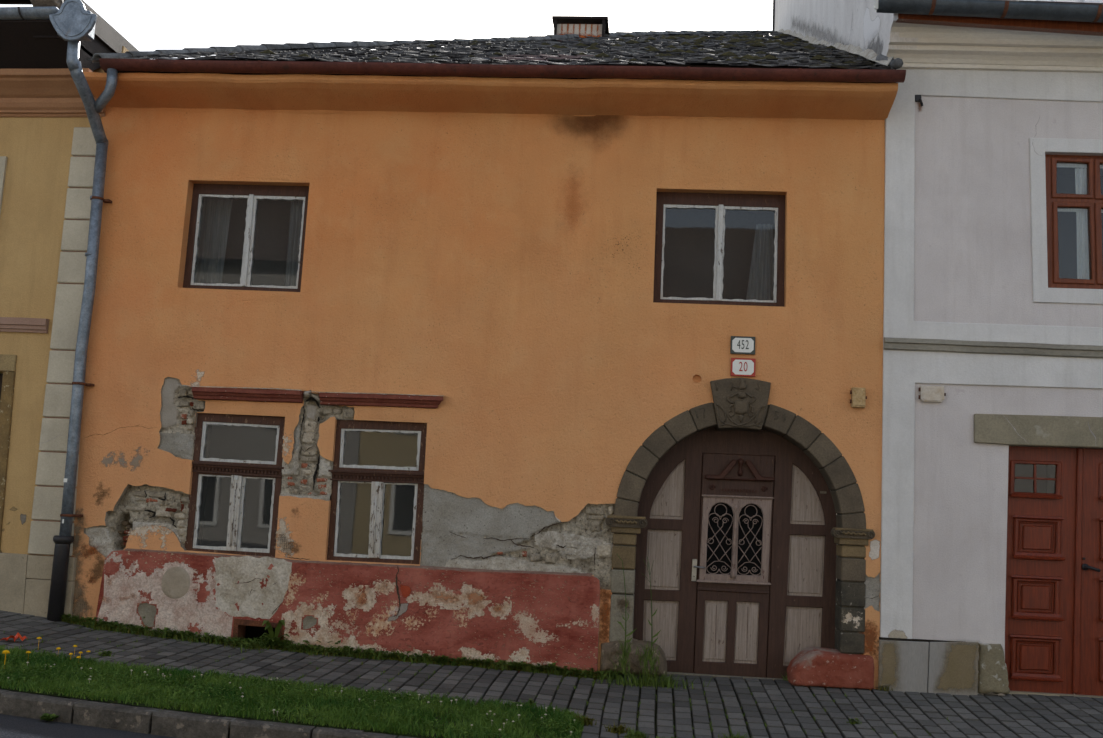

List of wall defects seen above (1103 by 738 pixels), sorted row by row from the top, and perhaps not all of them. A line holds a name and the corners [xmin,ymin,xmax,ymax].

flaking render [101,370,355,501]
peeling [85,485,233,642]
peeling [281,571,600,668]
flaking render [420,484,615,590]